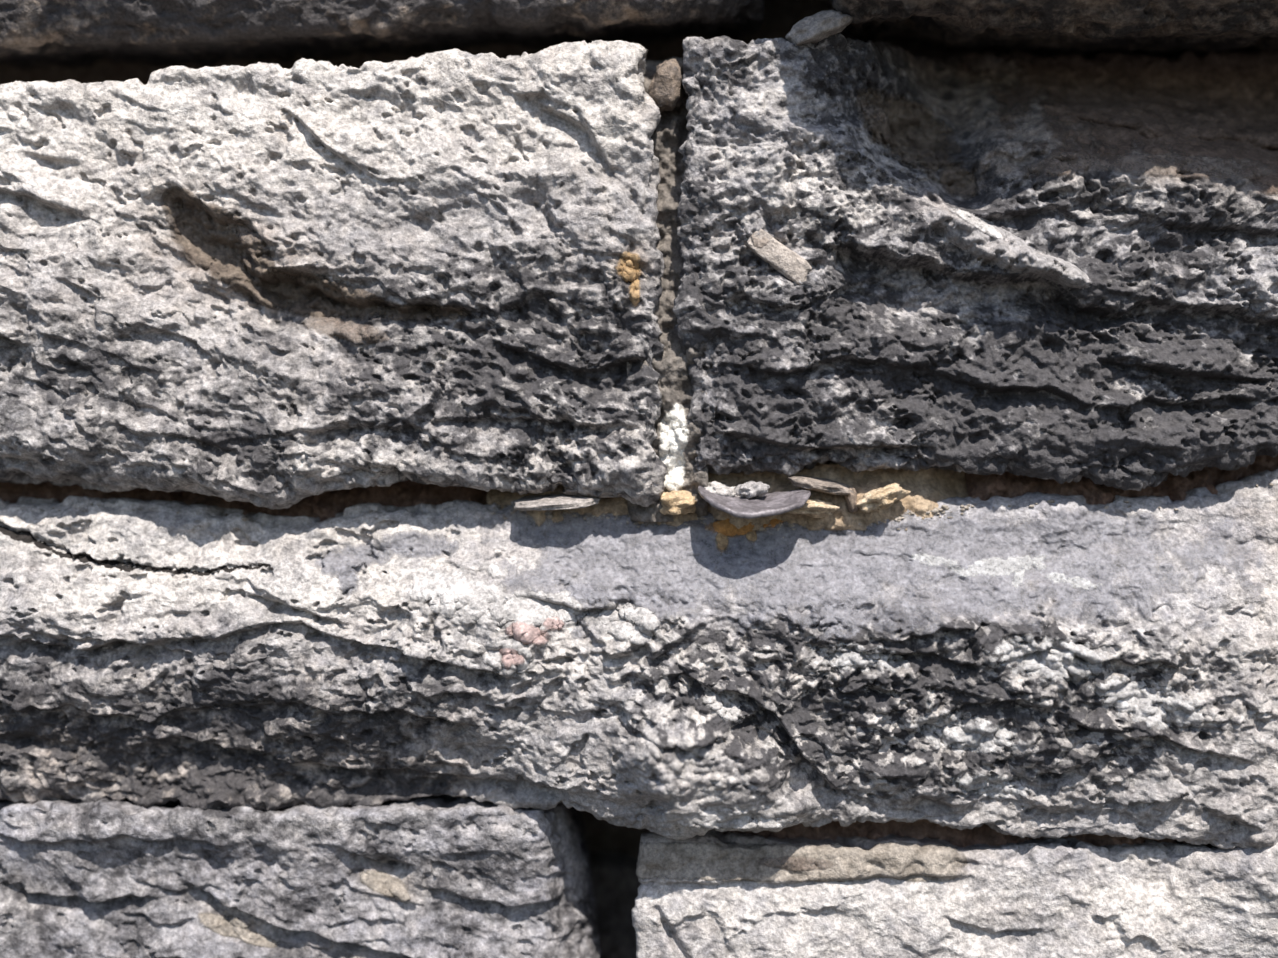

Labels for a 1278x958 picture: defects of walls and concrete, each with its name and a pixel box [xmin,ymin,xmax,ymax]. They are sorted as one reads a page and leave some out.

crack [0,526,271,576]